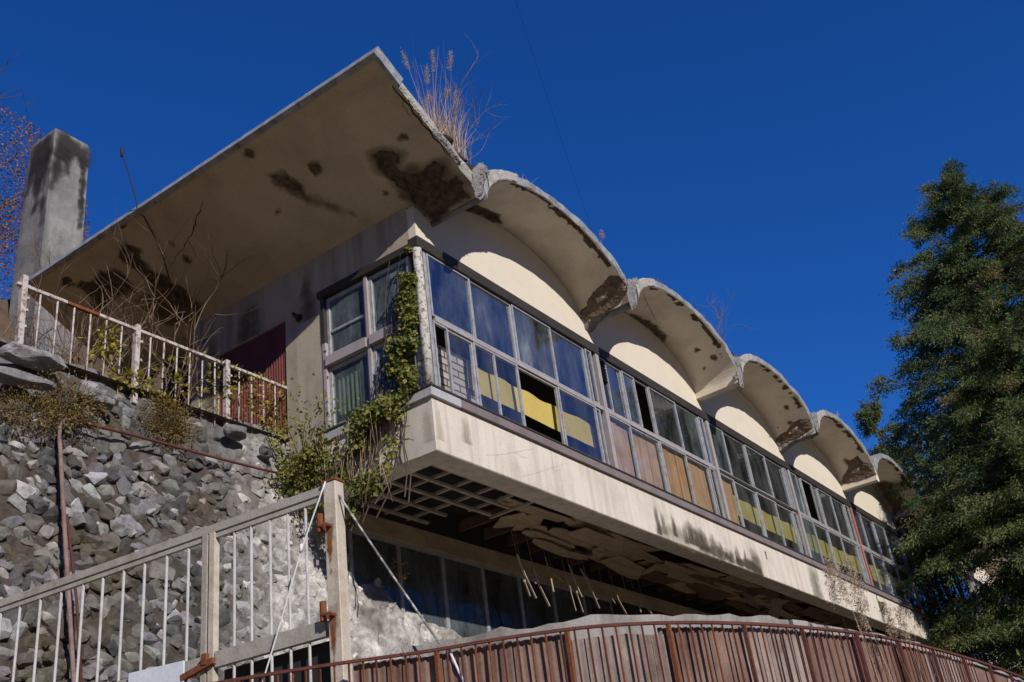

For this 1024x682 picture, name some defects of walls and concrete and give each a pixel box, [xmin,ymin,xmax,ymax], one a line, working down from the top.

damp [28,131,91,228]
crack [169,202,203,267]
damp [271,174,310,200]
damp [308,163,322,175]
peeling [372,83,721,348]
spalling [732,353,931,515]
damp [655,512,767,575]